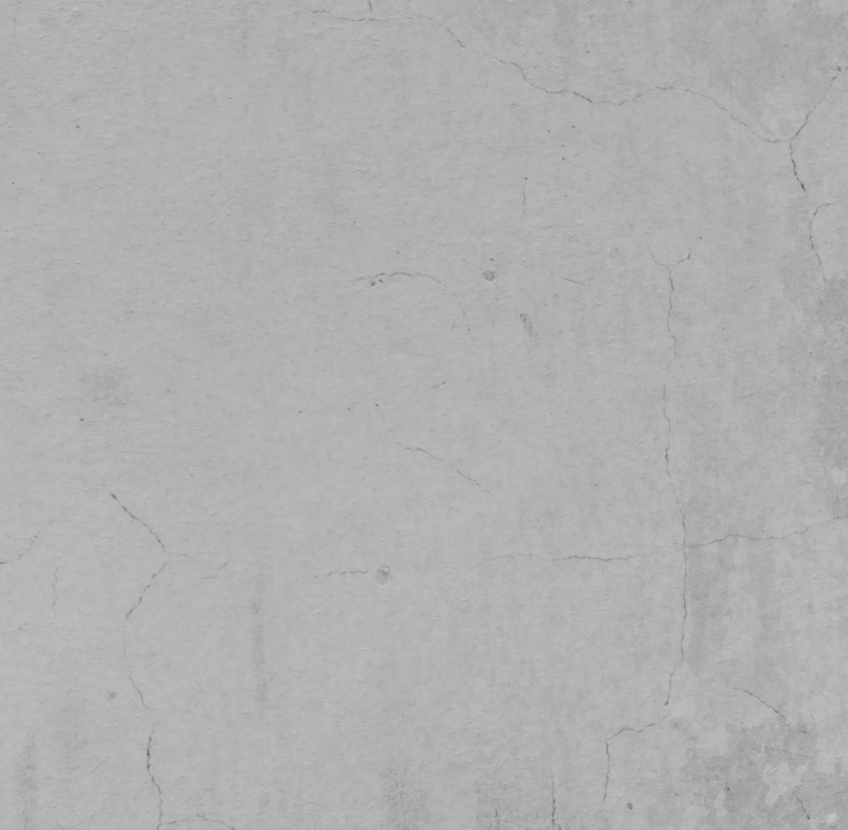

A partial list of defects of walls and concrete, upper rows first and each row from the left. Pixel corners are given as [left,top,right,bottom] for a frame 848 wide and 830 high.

crack [786,64,848,292]
crack [99,484,240,830]
crack [598,231,695,812]
crack [721,673,816,738]